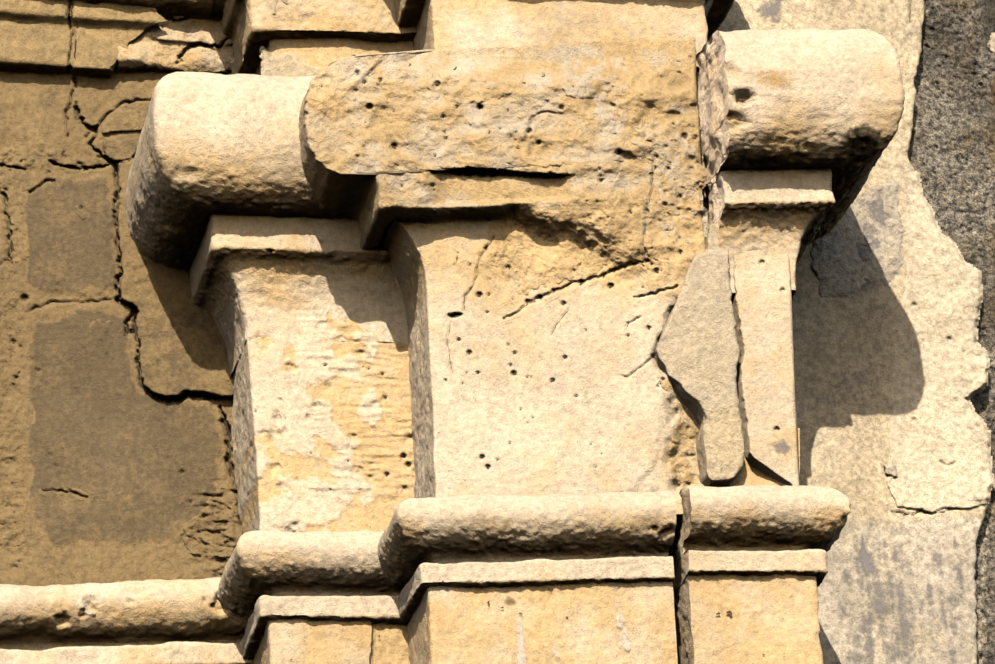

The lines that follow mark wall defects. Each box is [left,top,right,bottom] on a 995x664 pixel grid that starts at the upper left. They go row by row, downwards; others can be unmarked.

crack [4,1,242,548]
crack [447,239,493,368]
crack [508,226,649,335]
peeling [809,166,995,514]